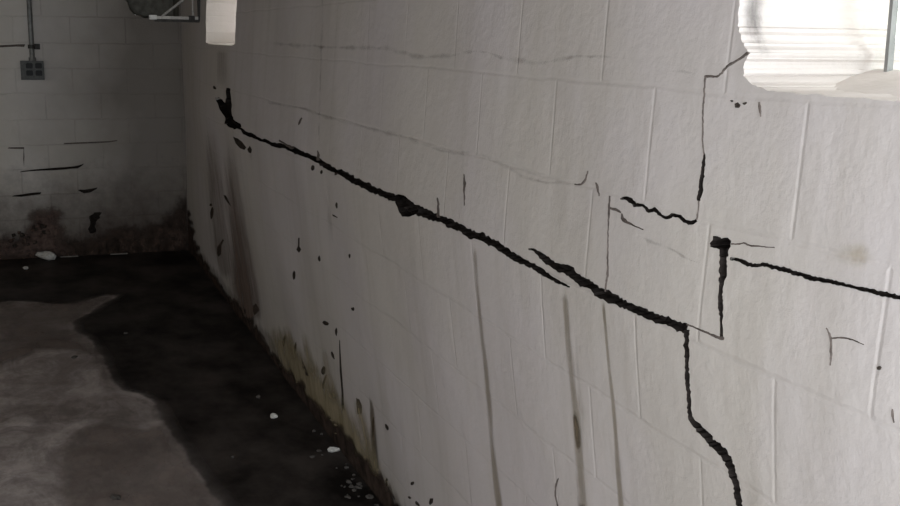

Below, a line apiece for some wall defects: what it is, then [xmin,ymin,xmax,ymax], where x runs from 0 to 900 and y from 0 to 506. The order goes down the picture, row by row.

crack [8,140,117,197]
damp [0,186,399,506]
crack [226,52,900,506]